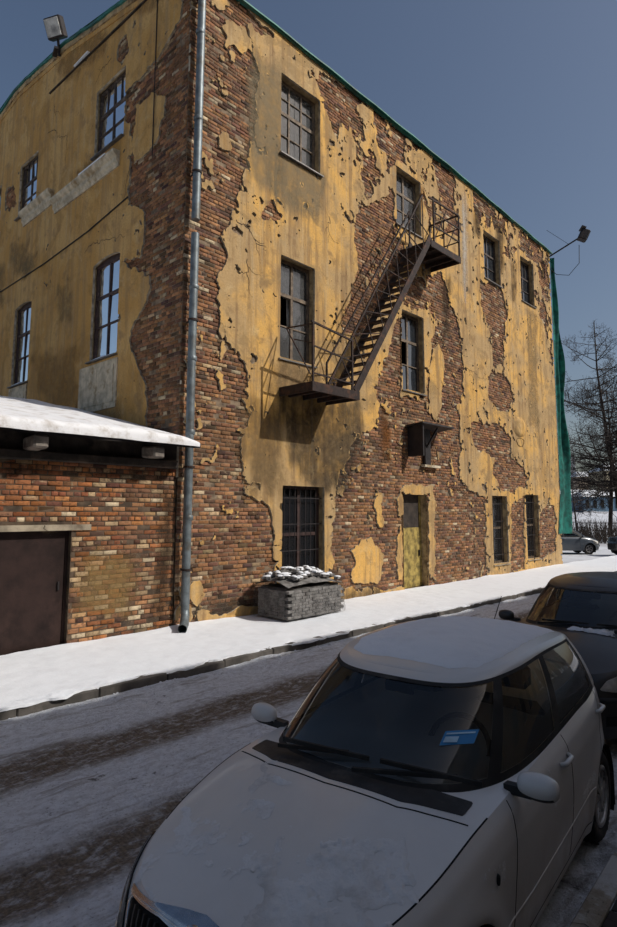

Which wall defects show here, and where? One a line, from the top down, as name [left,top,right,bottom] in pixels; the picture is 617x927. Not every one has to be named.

spalling [126,0,281,625]
spalling [311,71,461,337]
spalling [328,272,528,592]
spalling [472,192,553,365]
spalling [537,502,556,561]